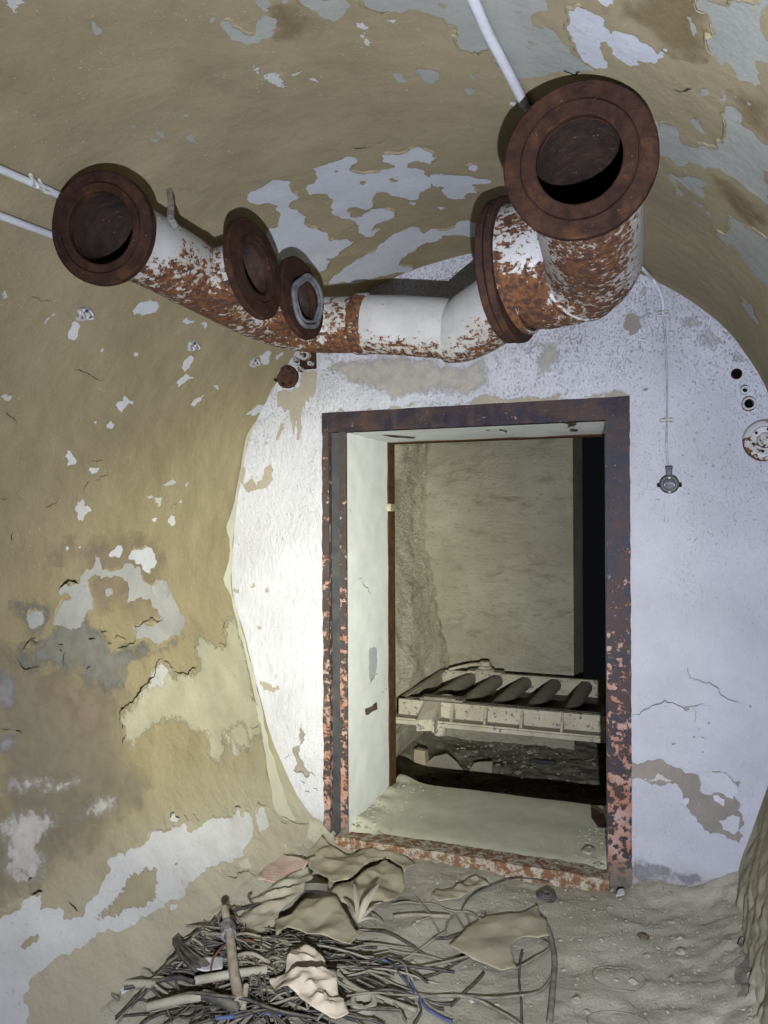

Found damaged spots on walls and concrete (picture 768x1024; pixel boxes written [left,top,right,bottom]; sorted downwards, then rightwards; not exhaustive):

peeling [687,0,768,86]
peeling [655,89,768,215]
peeling [247,146,491,284]
peeling [715,214,768,287]
peeling [177,356,194,387]
crack [18,638,91,670]
crack [89,617,162,648]
peeling [0,370,317,1024]
crack [119,620,229,743]
crack [636,669,737,739]
spalling [632,756,744,843]